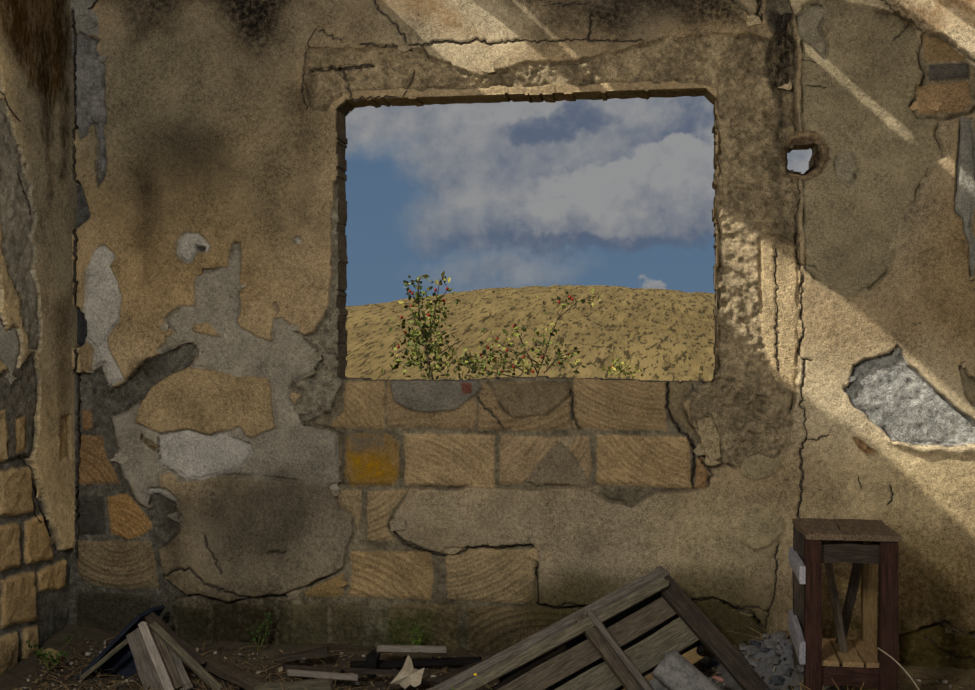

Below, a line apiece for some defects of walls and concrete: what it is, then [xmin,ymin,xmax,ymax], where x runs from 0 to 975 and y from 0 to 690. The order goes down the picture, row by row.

damp [223,0,285,39]
crack [301,0,643,109]
spalling [301,0,975,470]
spalling [0,86,712,675]
crack [774,178,828,518]
spalling [692,597,765,649]
crack [693,543,779,629]